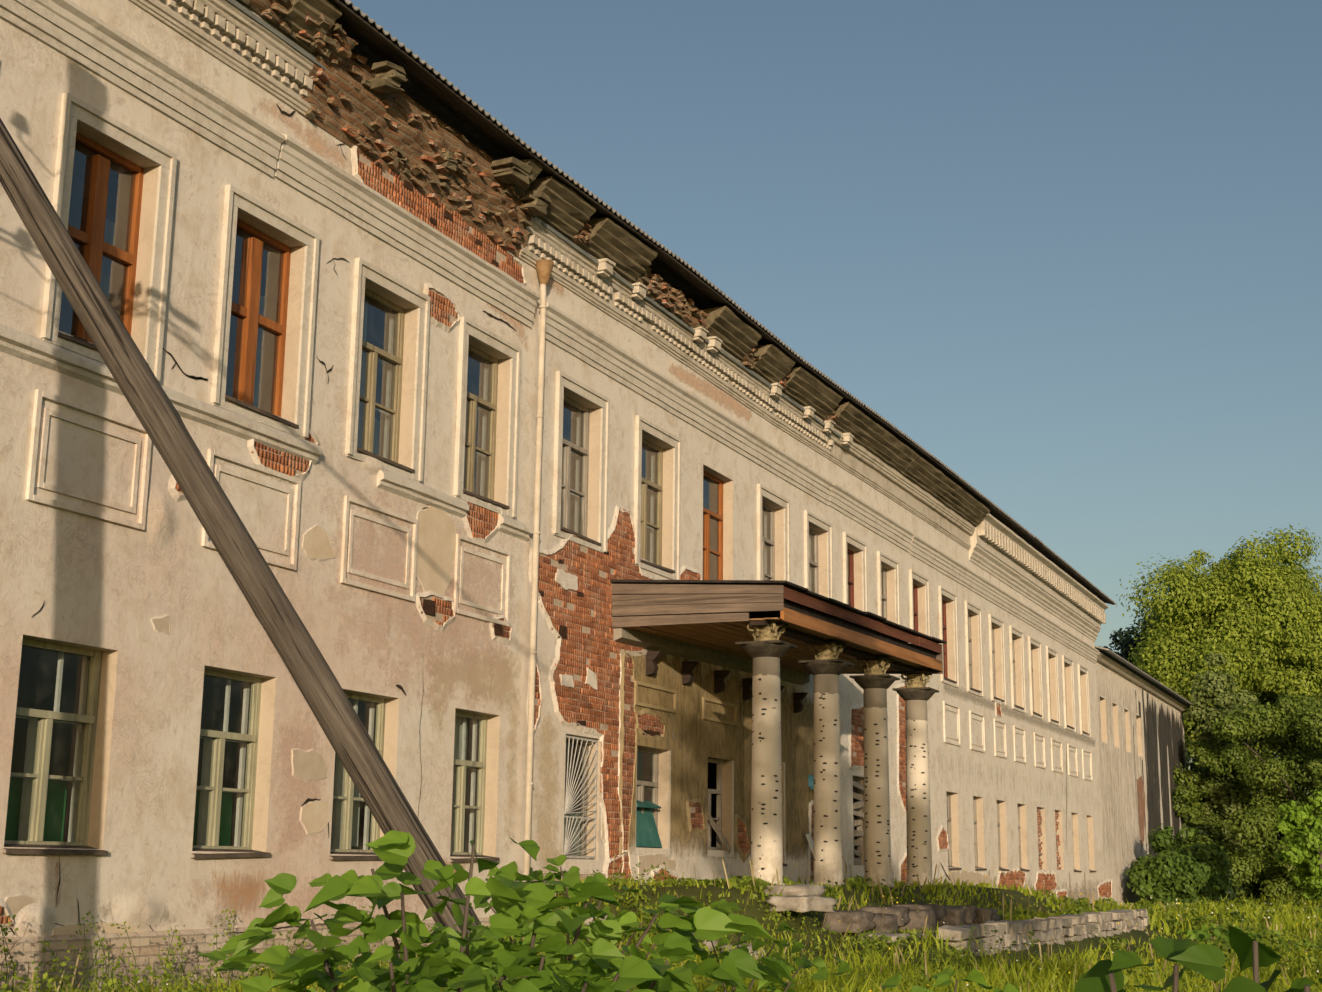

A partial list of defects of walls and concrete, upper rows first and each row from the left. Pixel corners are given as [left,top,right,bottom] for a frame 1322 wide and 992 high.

spalling [247,0,535,286]
flaking render [423,283,461,333]
flaking render [257,414,320,446]
flaking render [247,439,312,484]
peeling [415,493,502,633]
flaking render [680,565,701,580]
flaking render [488,614,512,645]
flaking render [526,505,682,885]
flaking render [848,703,864,771]
flaking render [936,824,948,853]
flaking render [941,867,1067,900]